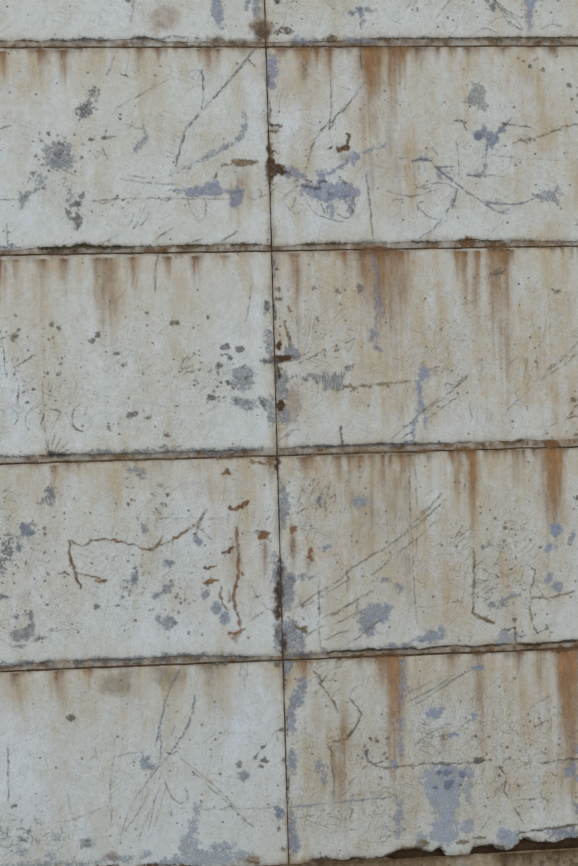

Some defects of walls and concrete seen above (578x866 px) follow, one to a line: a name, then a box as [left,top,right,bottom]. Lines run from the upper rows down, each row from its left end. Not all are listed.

corrosion [298,47,333,74]
corrosion [362,47,419,97]
peeling [21,132,83,202]
peeling [284,149,373,217]
corrosion [329,133,351,153]
corrosion [359,245,403,286]
corrosion [454,236,512,292]
corrosion [449,439,563,510]
corrosion [338,652,403,718]
corrosion [537,645,578,750]
peeling [311,766,578,861]